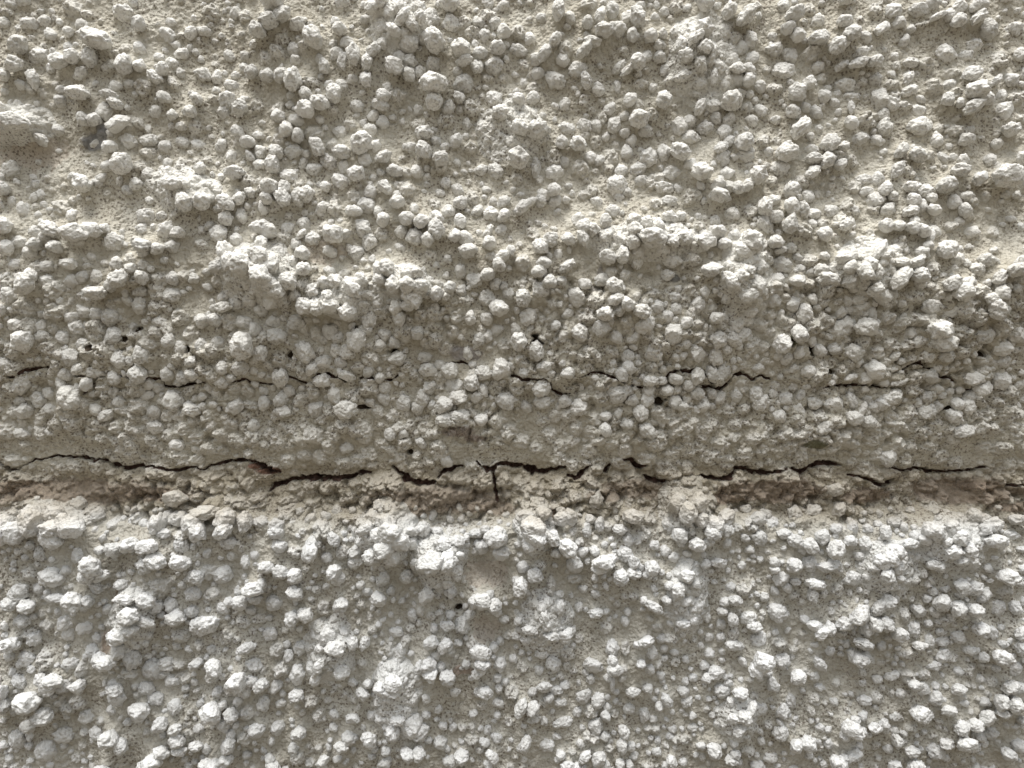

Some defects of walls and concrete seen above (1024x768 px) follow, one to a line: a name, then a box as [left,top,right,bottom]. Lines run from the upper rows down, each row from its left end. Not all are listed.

crack [0,454,666,502]
crack [700,460,986,486]